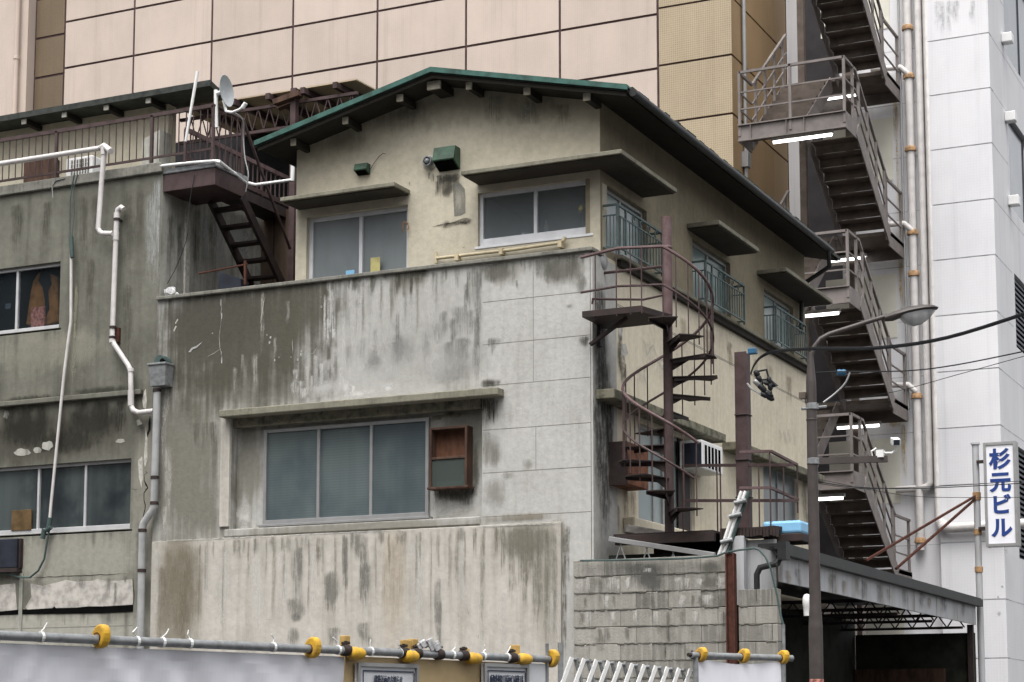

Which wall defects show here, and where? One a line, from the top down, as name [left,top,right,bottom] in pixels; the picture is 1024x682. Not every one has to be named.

leakage [433,174,470,227]
leakage [314,262,507,357]
leakage [293,364,363,396]
flaking render [14,441,53,456]
leakage [5,387,123,451]
peeling [0,579,133,615]
leakage [326,533,369,602]
leakage [495,514,549,603]